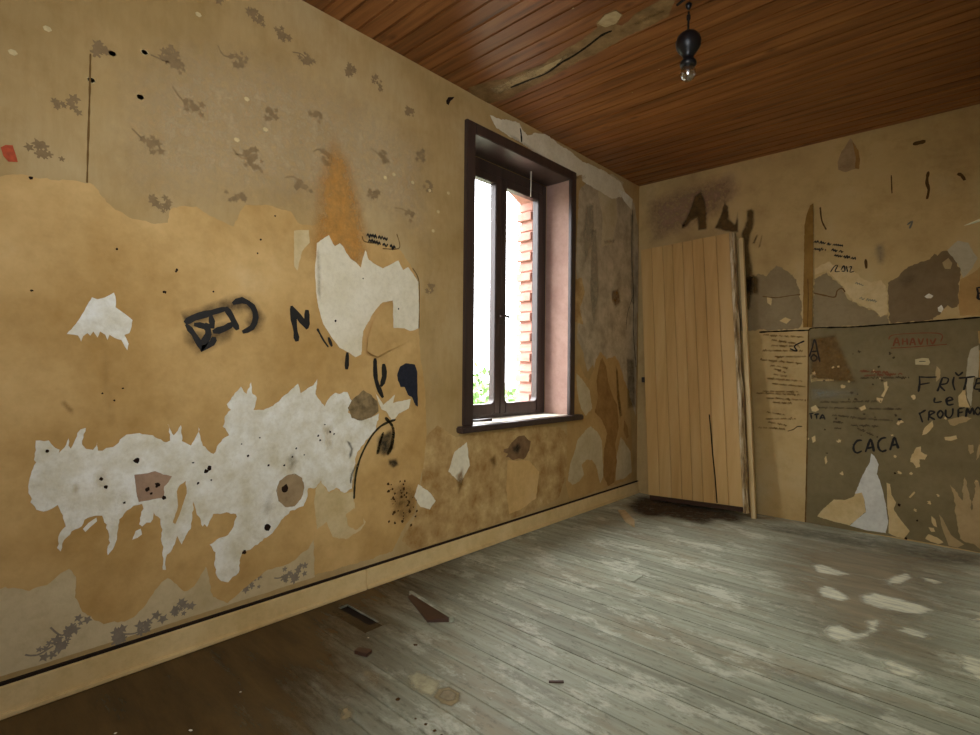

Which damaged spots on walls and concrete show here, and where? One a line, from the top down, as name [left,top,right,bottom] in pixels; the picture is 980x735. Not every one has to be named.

peeling [490,115,633,208]
peeling [468,0,675,103]
peeling [0,155,567,624]
damp [566,184,638,500]
peeling [740,241,980,553]